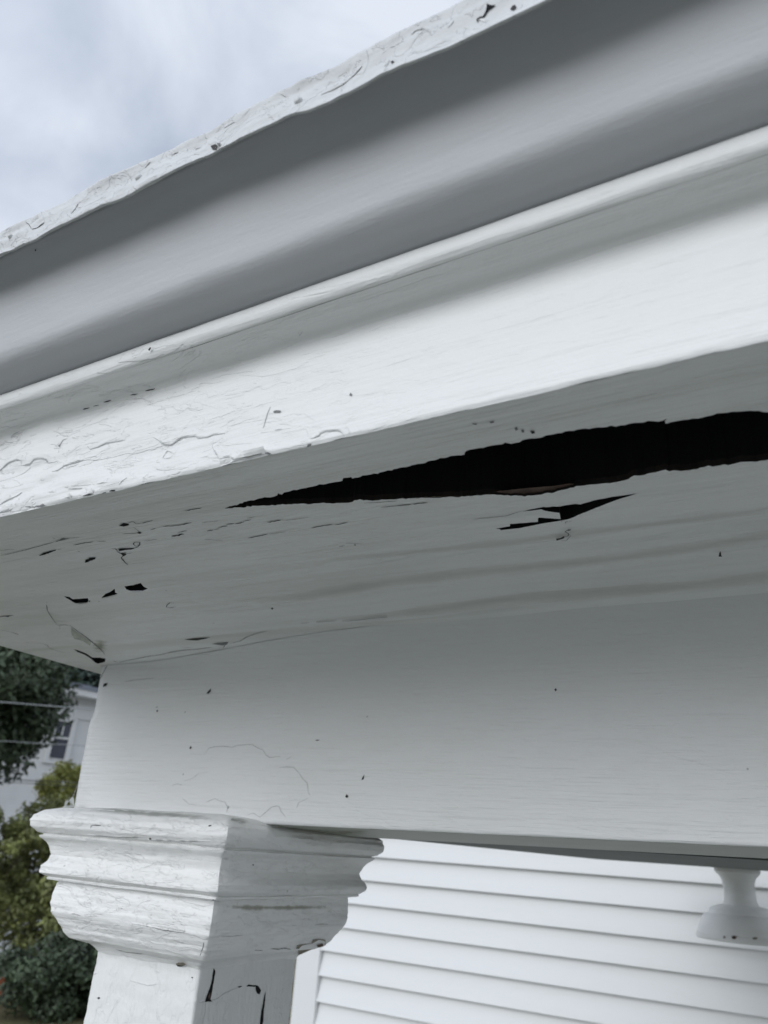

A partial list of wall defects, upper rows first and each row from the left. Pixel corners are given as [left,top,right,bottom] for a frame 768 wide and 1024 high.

crack [0,491,22,504]
crack [0,430,127,499]
crack [153,429,226,446]
crack [182,742,311,817]
crack [130,922,266,1024]